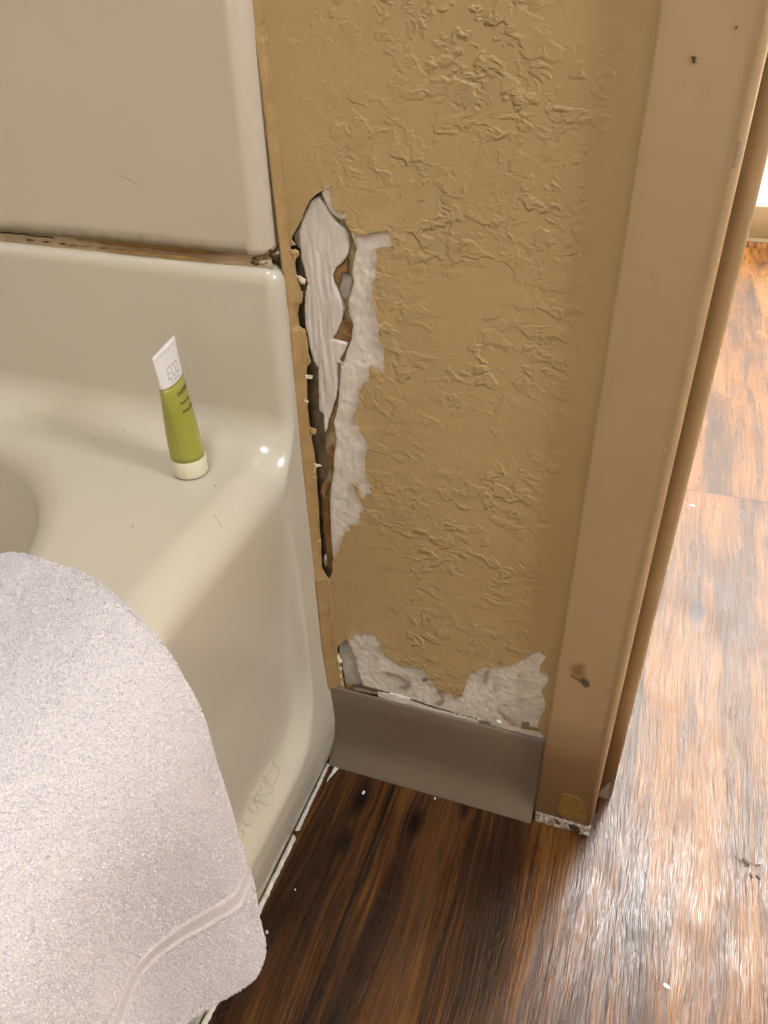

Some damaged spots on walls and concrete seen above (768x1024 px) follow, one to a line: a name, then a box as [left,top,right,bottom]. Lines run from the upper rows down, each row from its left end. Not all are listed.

peeling [289,186,393,578]
peeling [337,632,549,743]